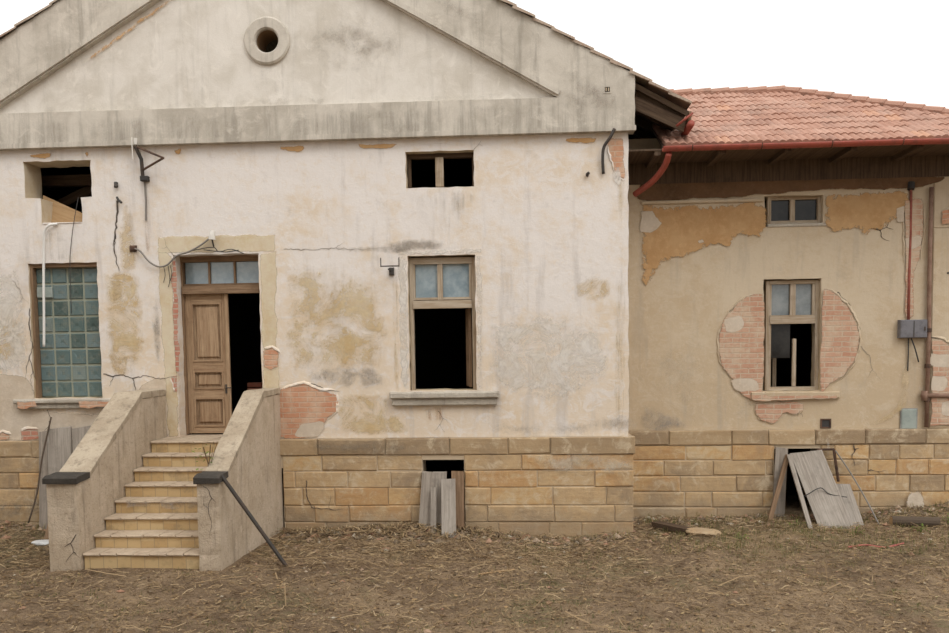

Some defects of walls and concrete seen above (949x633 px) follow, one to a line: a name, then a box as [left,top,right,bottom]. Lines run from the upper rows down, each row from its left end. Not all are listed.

spalling [607,138,625,185]
peeling [637,177,944,317]
peeling [0,374,109,441]
crack [106,374,174,390]
spalling [263,345,281,369]
spalling [280,381,403,439]
spalling [716,287,862,424]
spalling [930,336,949,426]